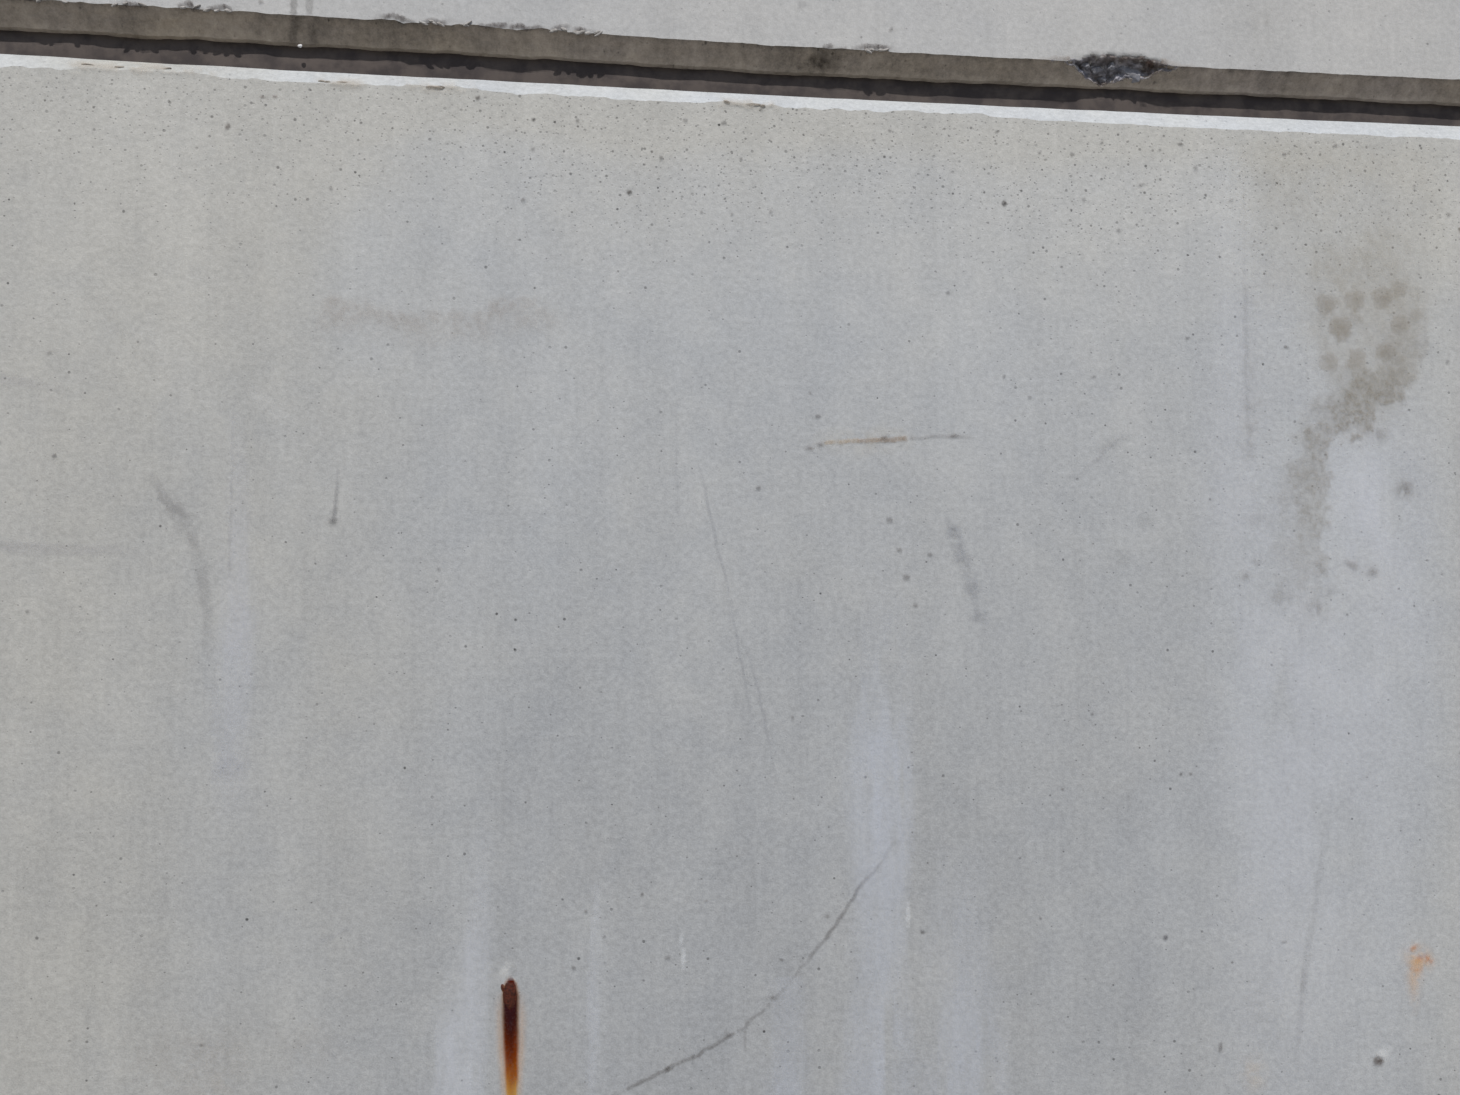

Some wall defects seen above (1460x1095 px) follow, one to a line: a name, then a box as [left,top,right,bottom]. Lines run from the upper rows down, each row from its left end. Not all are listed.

spalling [1051,55,1177,86]
corrosion [501,979,518,1095]